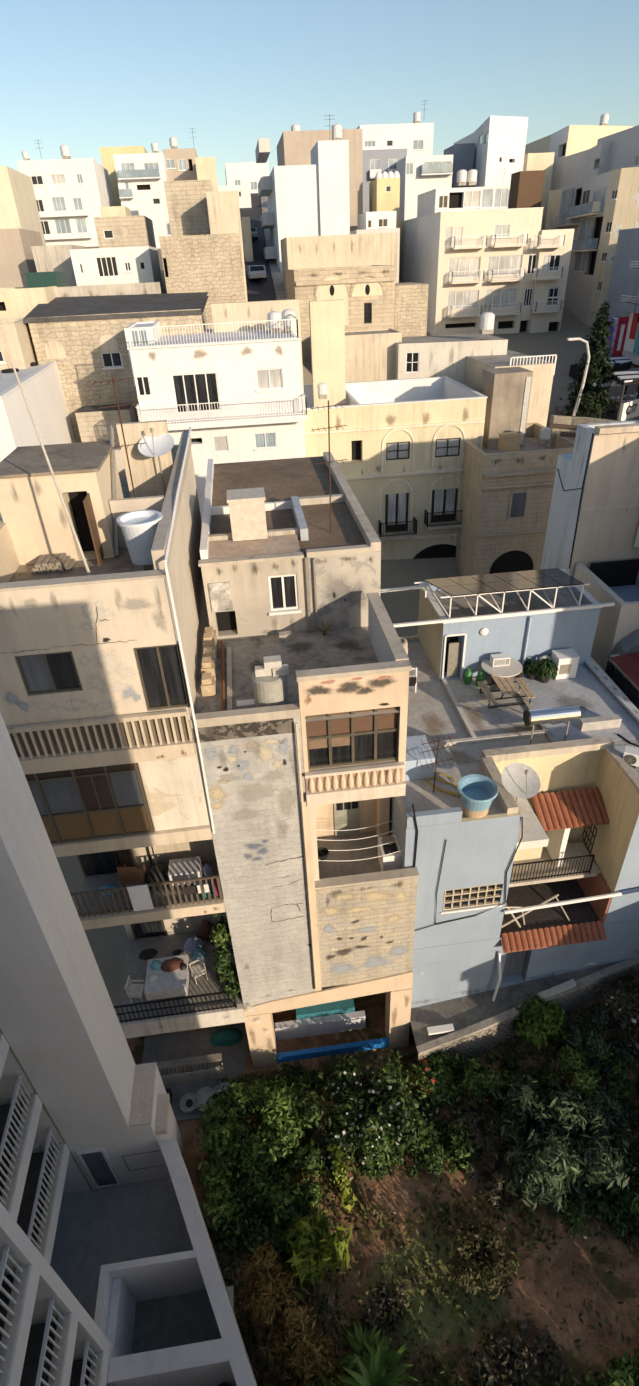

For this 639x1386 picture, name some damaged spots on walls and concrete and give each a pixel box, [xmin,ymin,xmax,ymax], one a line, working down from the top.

crack [0,606,135,654]
peeling [205,739,296,860]
peeling [324,892,406,973]